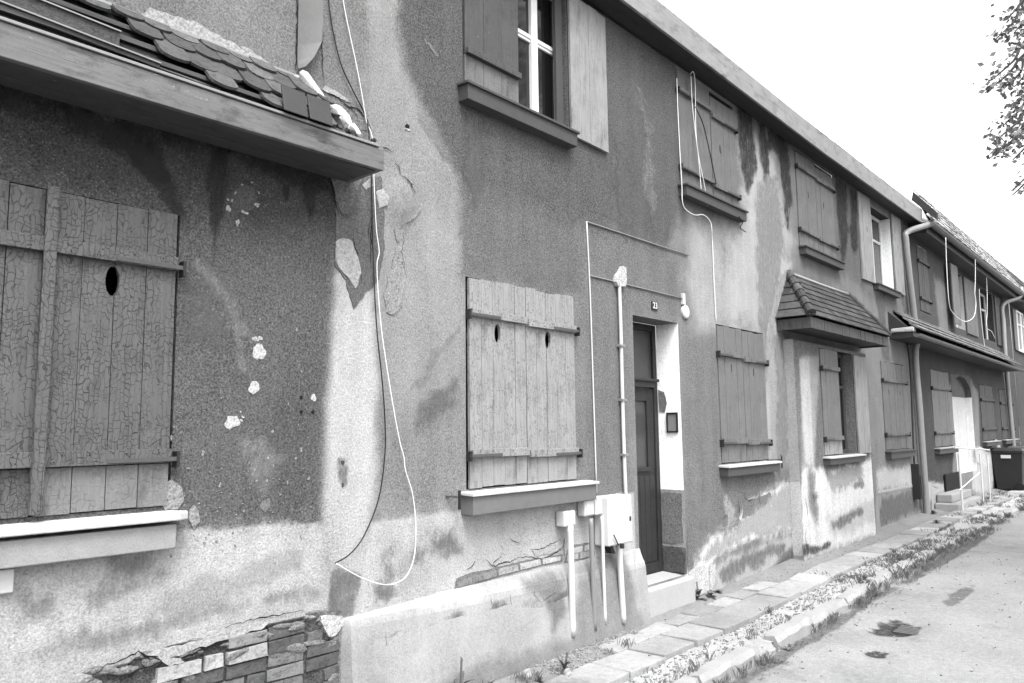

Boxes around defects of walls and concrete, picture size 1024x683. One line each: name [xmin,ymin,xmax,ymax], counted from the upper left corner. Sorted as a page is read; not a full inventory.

leakage [242,155,334,217]
peeling [331,176,406,315]
leakage [835,180,858,261]
leakage [699,108,792,559]
leakage [809,463,864,520]
leakage [832,509,863,527]
flaking render [454,539,595,589]
leakage [720,541,831,582]
flaking render [73,609,344,683]